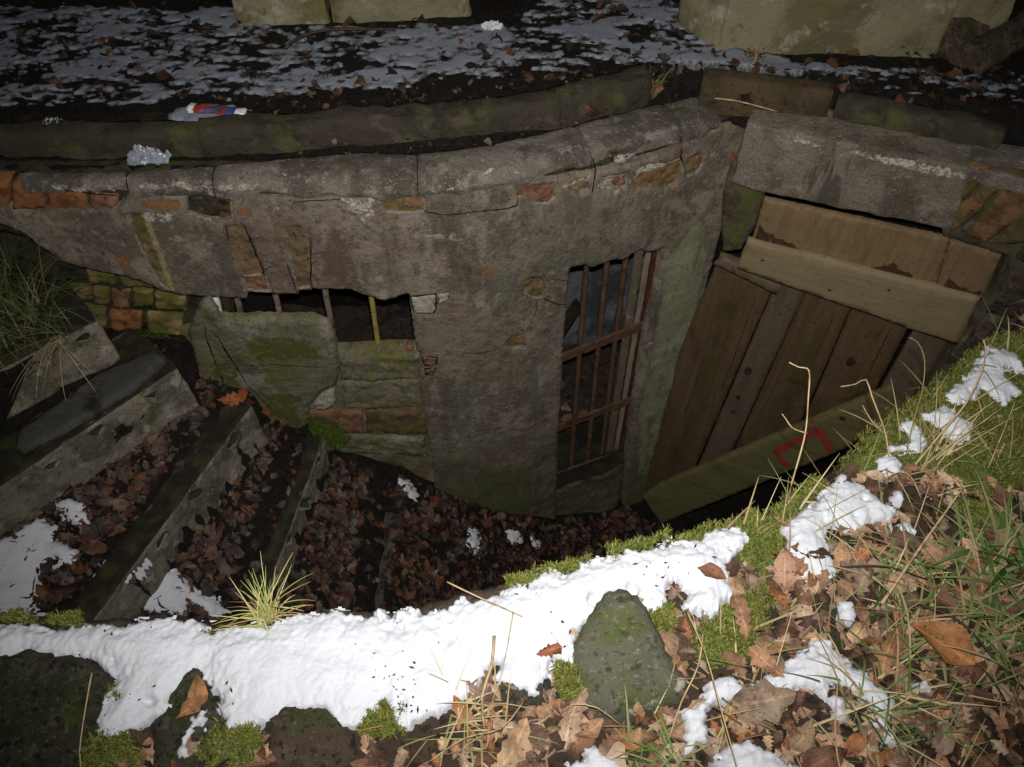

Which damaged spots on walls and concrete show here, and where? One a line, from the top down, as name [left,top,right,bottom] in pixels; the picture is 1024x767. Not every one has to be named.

spalling [569,154,704,191]
spalling [187,196,234,223]
crack [289,199,340,209]
spalling [384,197,426,215]
crack [422,193,518,216]
spalling [517,183,556,206]
crack [223,197,319,293]
spalling [409,291,450,314]
crack [205,327,332,407]